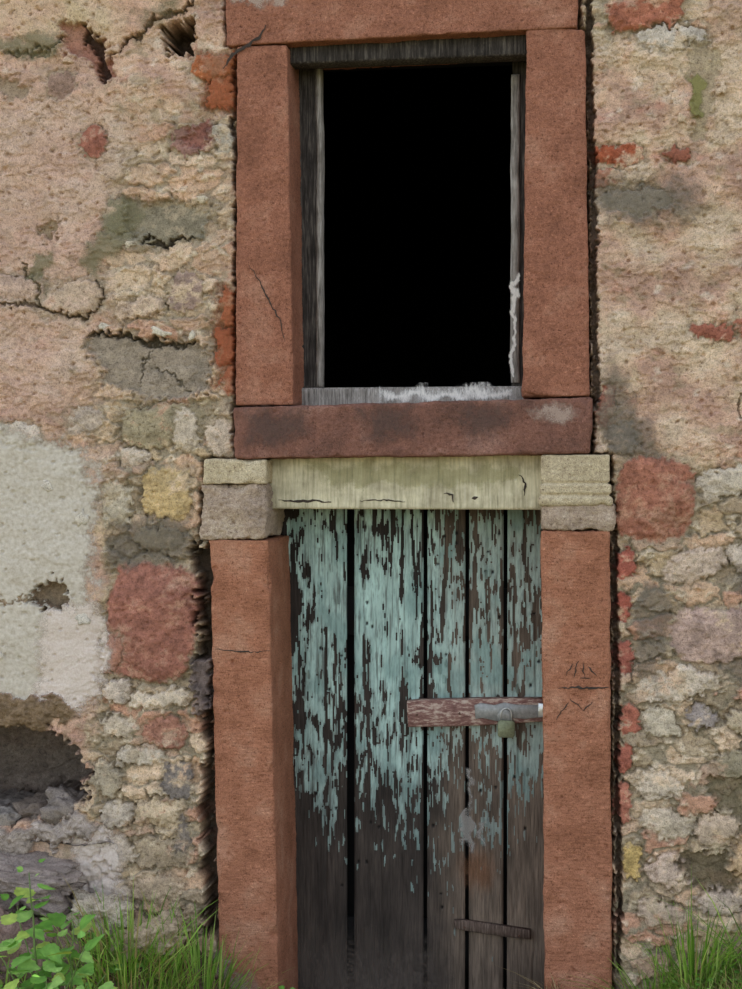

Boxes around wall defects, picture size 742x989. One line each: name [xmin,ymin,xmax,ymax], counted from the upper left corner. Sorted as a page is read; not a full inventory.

crack [107,0,195,56]
crack [0,261,106,321]
spalling [0,692,116,856]